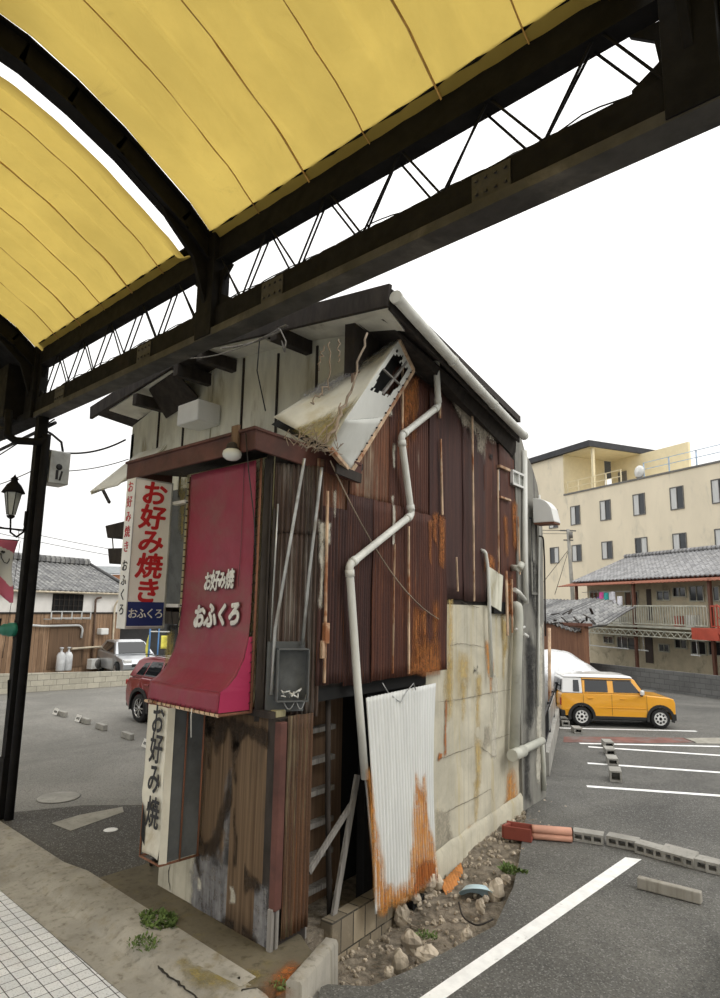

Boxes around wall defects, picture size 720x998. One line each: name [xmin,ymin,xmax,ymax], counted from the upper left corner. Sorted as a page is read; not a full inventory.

rust [429,515,445,566]
rust [412,605,440,674]
leakage [525,562,543,802]
leakage [190,715,268,948]
rust [370,778,438,913]
rust [507,775,516,801]